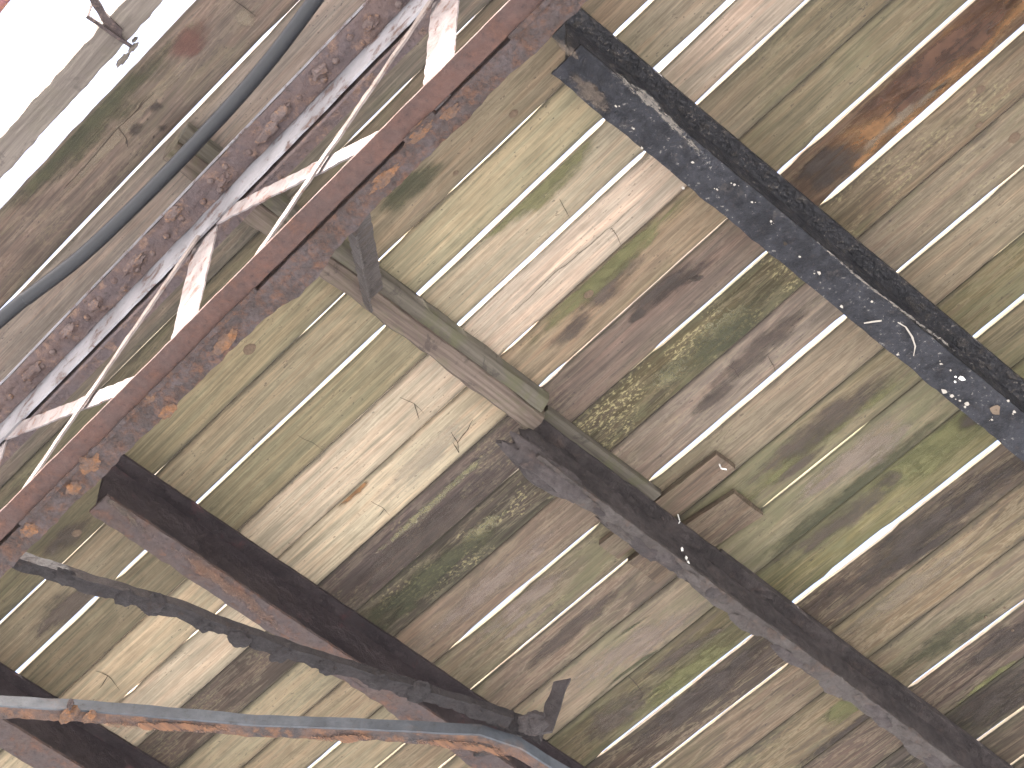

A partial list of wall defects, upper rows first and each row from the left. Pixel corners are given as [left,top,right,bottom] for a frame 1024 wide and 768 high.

rust [572,75,608,112]
rust [843,0,1024,169]
leakage [384,165,439,210]
leakage [558,261,632,342]
leakage [630,263,707,322]
leakage [754,387,875,480]
rust [340,482,367,505]
leakage [365,478,492,589]
leakage [800,472,901,553]
leakage [824,462,1024,599]
rust [106,722,224,732]